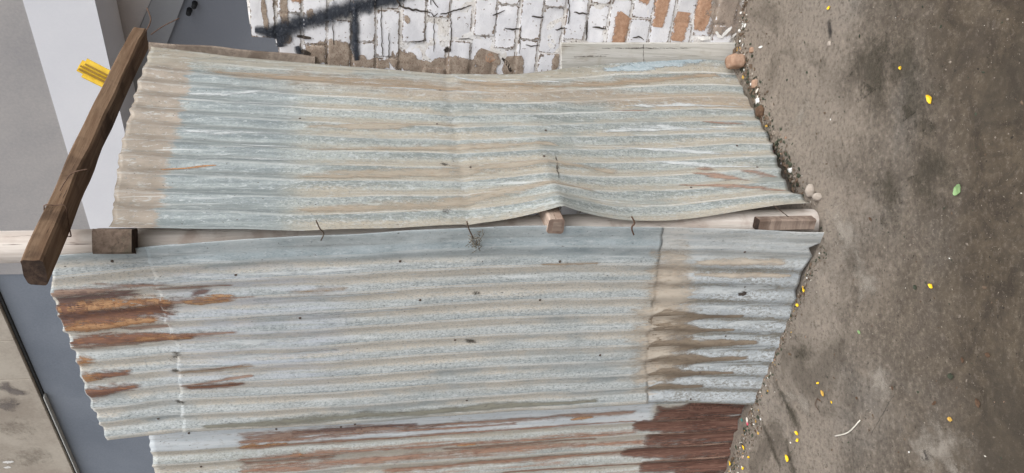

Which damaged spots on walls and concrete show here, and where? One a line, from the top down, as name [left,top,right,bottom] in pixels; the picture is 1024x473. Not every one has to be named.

peeling [612,11,631,42]
peeling [639,0,742,42]
spalling [305,39,524,74]
corrosion [50,284,253,398]
corrosion [238,403,745,473]